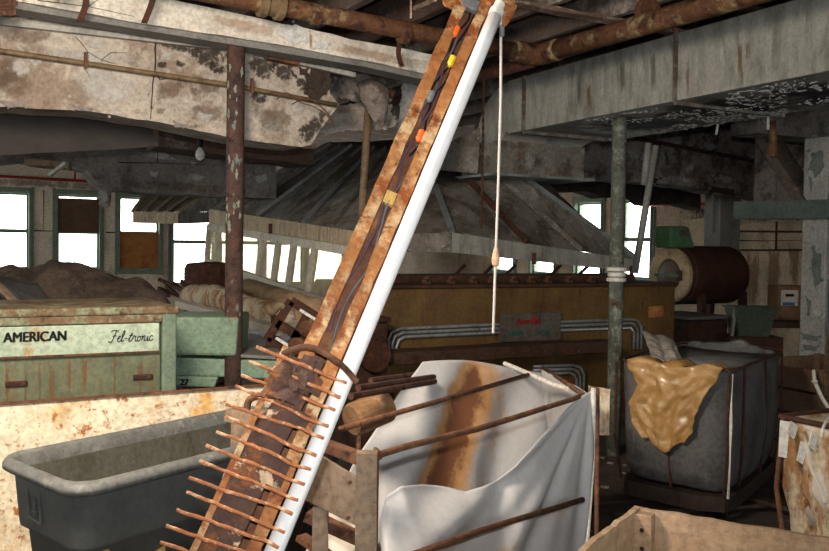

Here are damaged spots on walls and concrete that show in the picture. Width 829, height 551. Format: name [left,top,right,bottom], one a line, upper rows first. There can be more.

leakage [248,57,311,92]
leakage [298,110,329,143]
peeling [623,78,829,151]
peeling [807,148,824,192]
peeling [809,246,824,288]